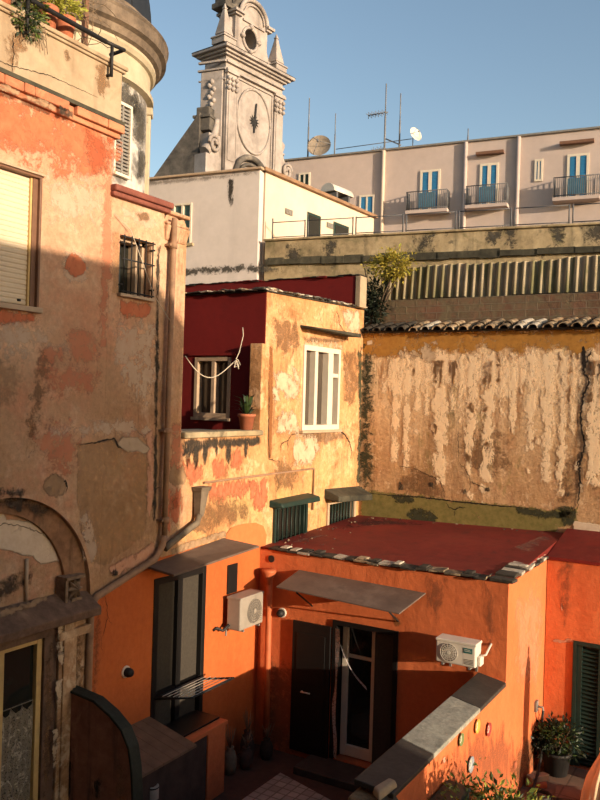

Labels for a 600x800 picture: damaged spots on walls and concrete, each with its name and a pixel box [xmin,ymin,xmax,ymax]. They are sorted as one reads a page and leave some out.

leakage [121,82,148,184]
leakage [323,240,337,265]
leakage [486,225,518,249]
leakage [548,226,566,246]
leakage [581,222,600,245]
leakage [186,264,278,276]
crack [77,438,122,449]
leakage [182,436,260,469]
peeling [272,365,321,467]
peeling [381,340,600,503]
crack [574,346,600,508]
peeling [0,514,59,565]